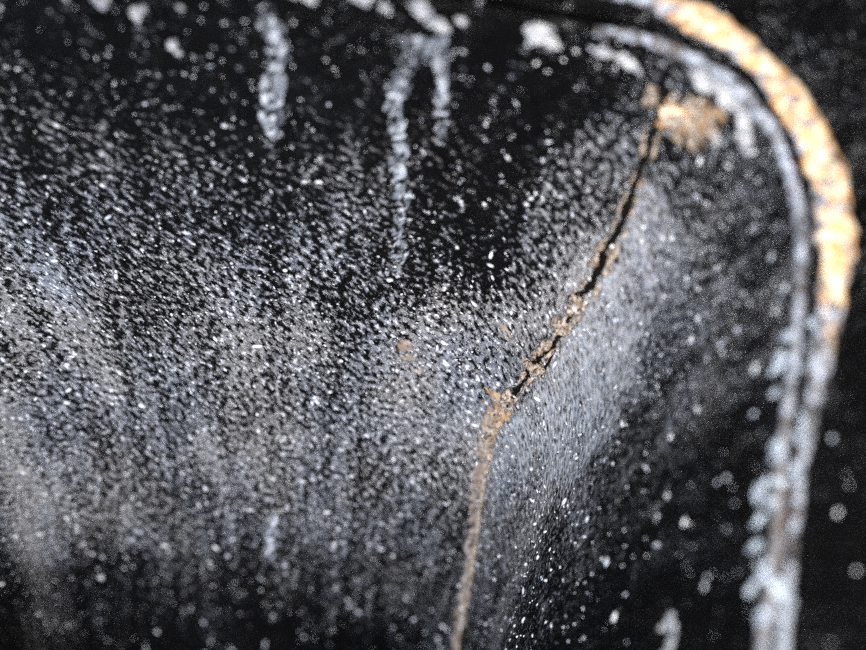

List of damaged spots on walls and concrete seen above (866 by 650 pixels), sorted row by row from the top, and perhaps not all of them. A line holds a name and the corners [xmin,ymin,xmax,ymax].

water stain [254,2,290,147]
water stain [356,33,449,302]
crack [498,85,676,422]
rust [659,0,857,340]